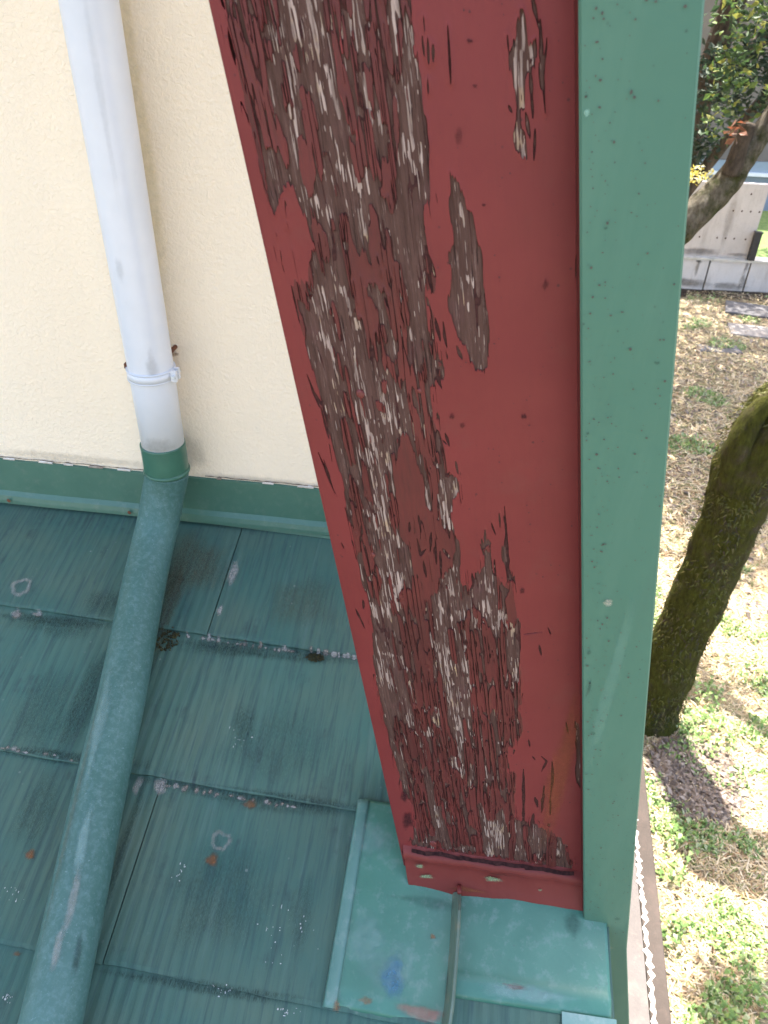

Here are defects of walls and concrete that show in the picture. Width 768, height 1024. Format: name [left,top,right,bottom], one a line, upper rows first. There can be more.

peeling [225,0,576,869]